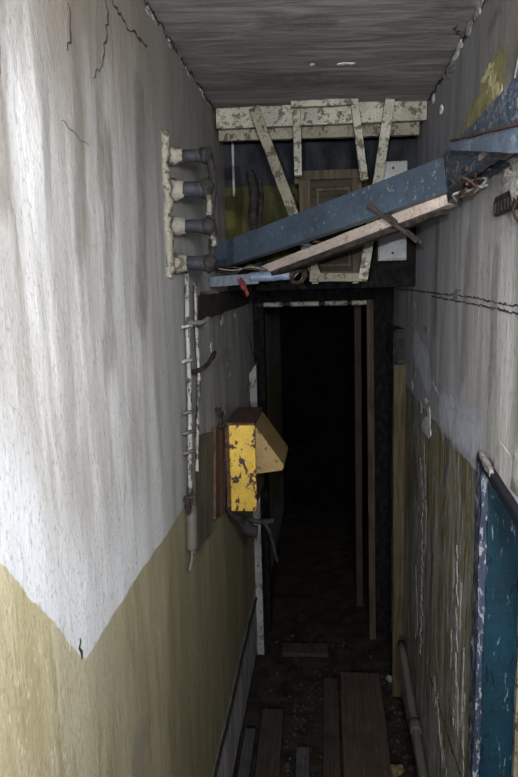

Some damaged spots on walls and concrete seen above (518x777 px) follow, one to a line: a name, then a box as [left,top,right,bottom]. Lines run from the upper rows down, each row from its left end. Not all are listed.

crack [65,3,73,51]
crack [94,0,148,78]
spalling [447,0,484,79]
peeling [481,63,503,104]
crack [397,288,518,316]